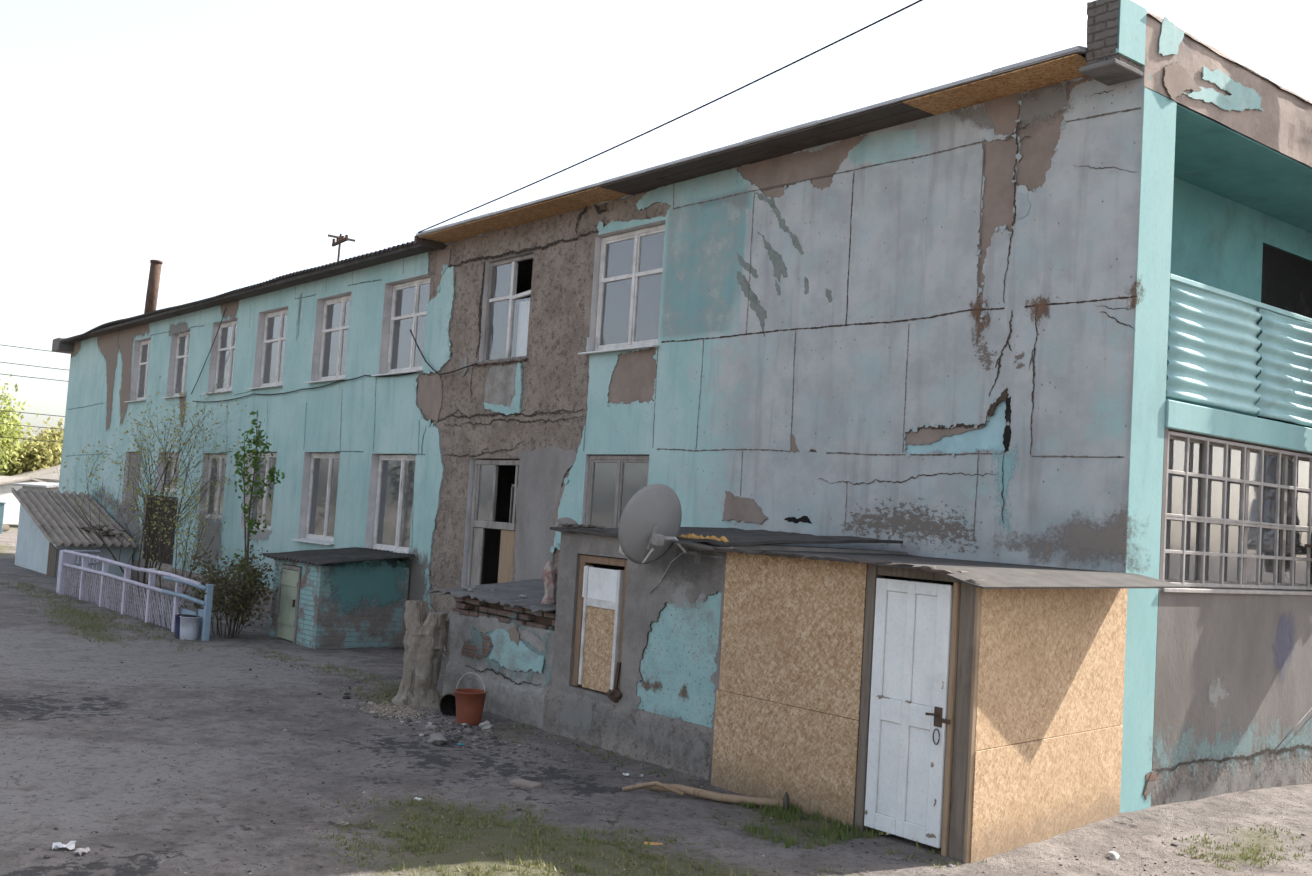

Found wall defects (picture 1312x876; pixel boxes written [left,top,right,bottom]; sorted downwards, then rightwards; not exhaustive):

crack [449,204,606,266]
peeling [730,135,867,199]
crack [820,95,1038,523]
peeling [951,76,1093,323]
spalling [413,191,671,659]
peeling [905,388,1012,458]
peeling [637,579,721,728]